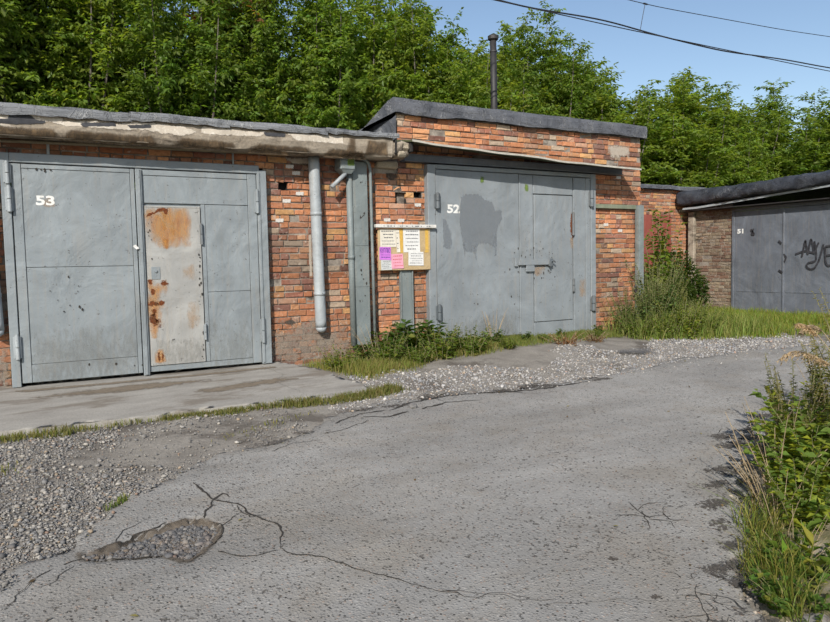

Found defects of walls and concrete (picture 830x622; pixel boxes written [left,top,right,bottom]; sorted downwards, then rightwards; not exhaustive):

damp [0,126,157,146]
damp [172,138,235,151]
damp [248,144,311,164]
rust [147,208,188,248]
rust [148,280,169,338]
crack [193,482,284,546]